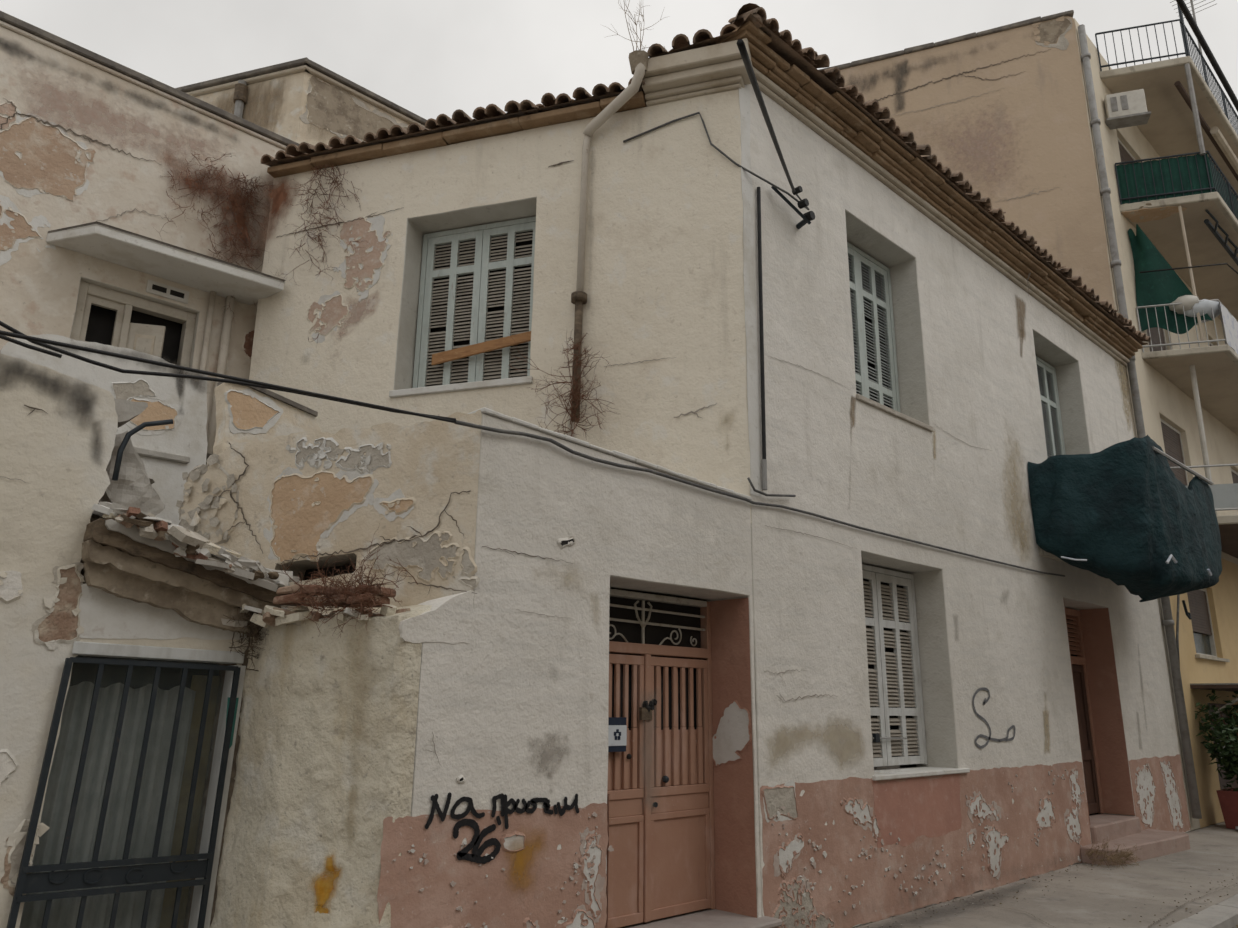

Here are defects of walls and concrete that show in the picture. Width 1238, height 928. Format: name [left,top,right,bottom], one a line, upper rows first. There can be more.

peeling [0,100,96,266]
peeling [307,215,393,343]
peeling [111,374,187,436]
peeling [224,389,283,434]
peeling [127,454,239,560]
peeling [263,437,481,590]
crack [213,443,573,565]
spalling [32,562,85,650]
crack [408,582,477,596]
peeling [712,700,752,768]
leakage [773,725,861,762]
peeling [761,780,1009,928]